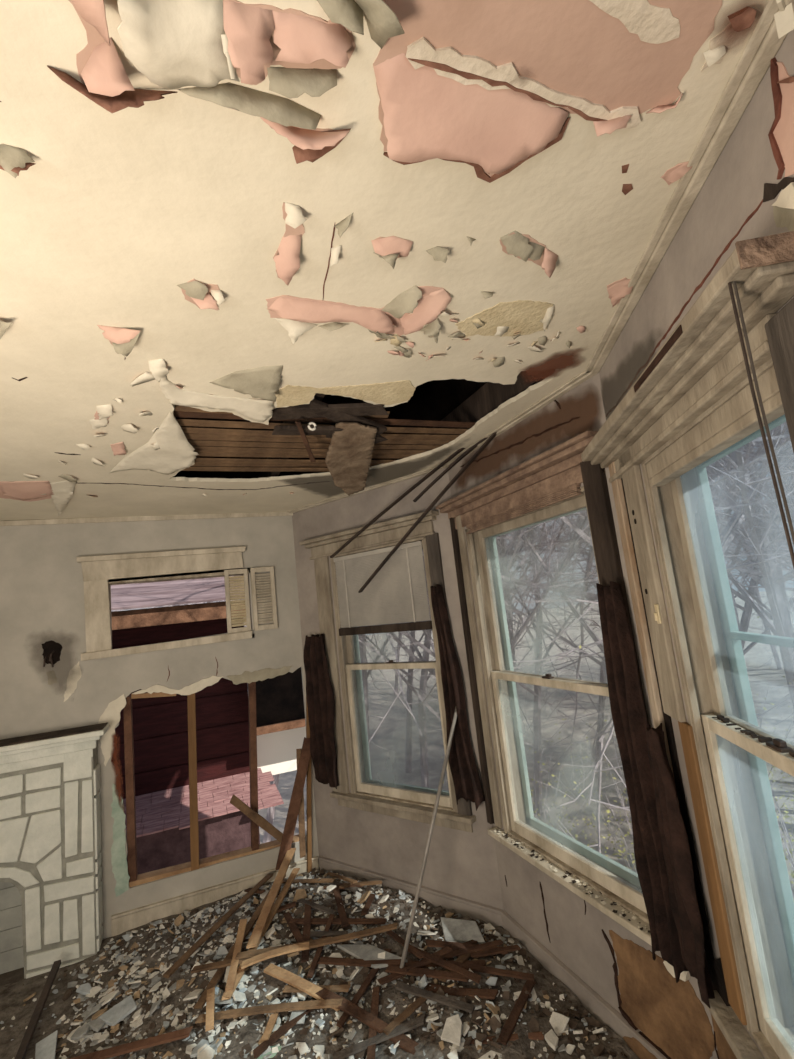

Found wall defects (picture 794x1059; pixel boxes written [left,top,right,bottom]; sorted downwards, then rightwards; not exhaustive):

peeling [47,0,762,185]
peeling [622,164,633,195]
peeling [763,57,794,232]
peeling [266,202,585,367]
peeling [75,359,416,475]
damp [457,339,654,487]
peeling [0,460,77,516]
spalling [98,666,292,766]
spalling [111,784,130,897]
crack [540,882,551,943]
spalling [609,930,737,1059]